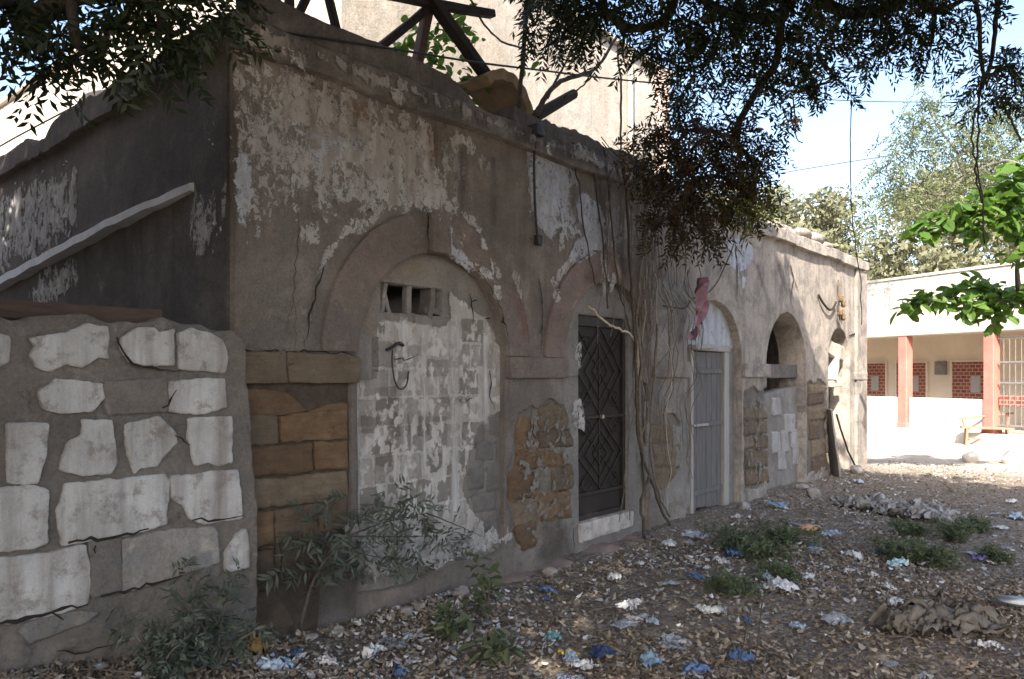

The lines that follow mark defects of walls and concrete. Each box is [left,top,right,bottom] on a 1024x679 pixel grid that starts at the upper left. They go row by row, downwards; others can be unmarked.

peeling [0,160,80,274]
peeling [29,257,79,303]
crack [245,192,356,357]
peeling [188,26,522,301]
peeling [524,142,616,303]
peeling [727,236,755,290]
peeling [246,291,585,632]